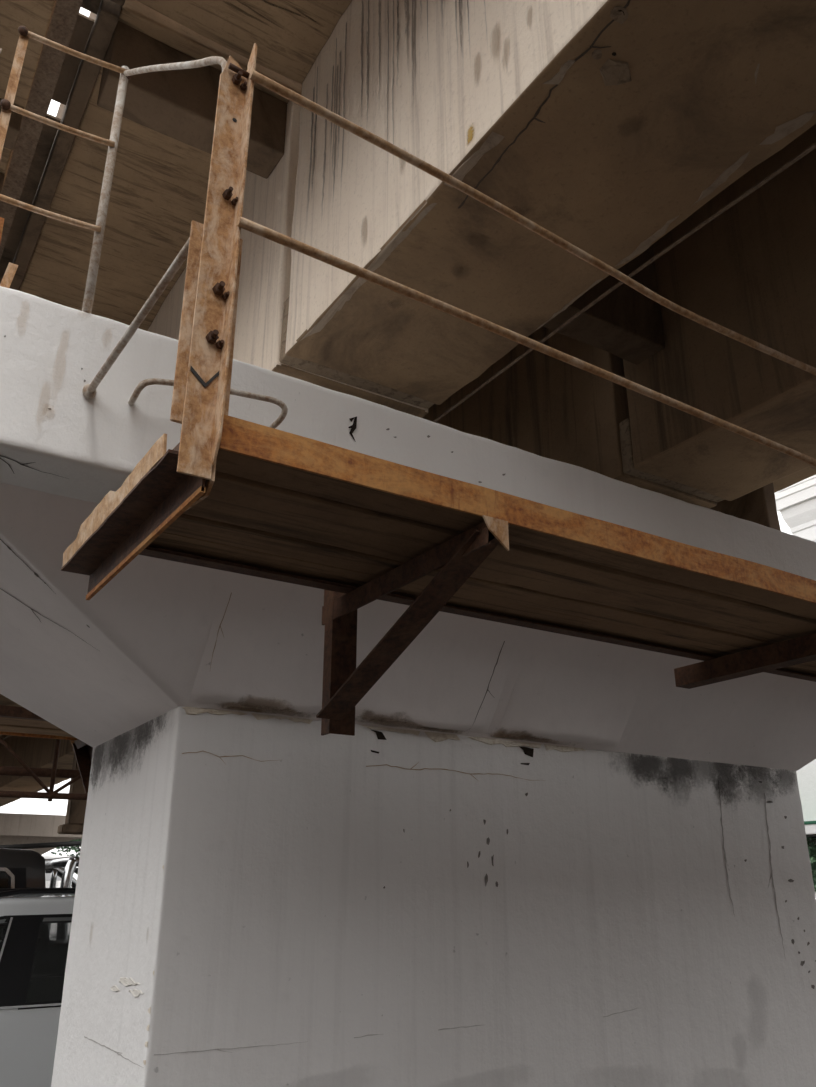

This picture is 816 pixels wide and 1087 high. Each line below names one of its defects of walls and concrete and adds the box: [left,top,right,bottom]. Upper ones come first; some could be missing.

crack [573,0,631,64]
crack [458,84,558,209]
crack [0,455,65,478]
crack [0,539,93,647]
crack [466,641,505,731]
crack [366,762,545,781]